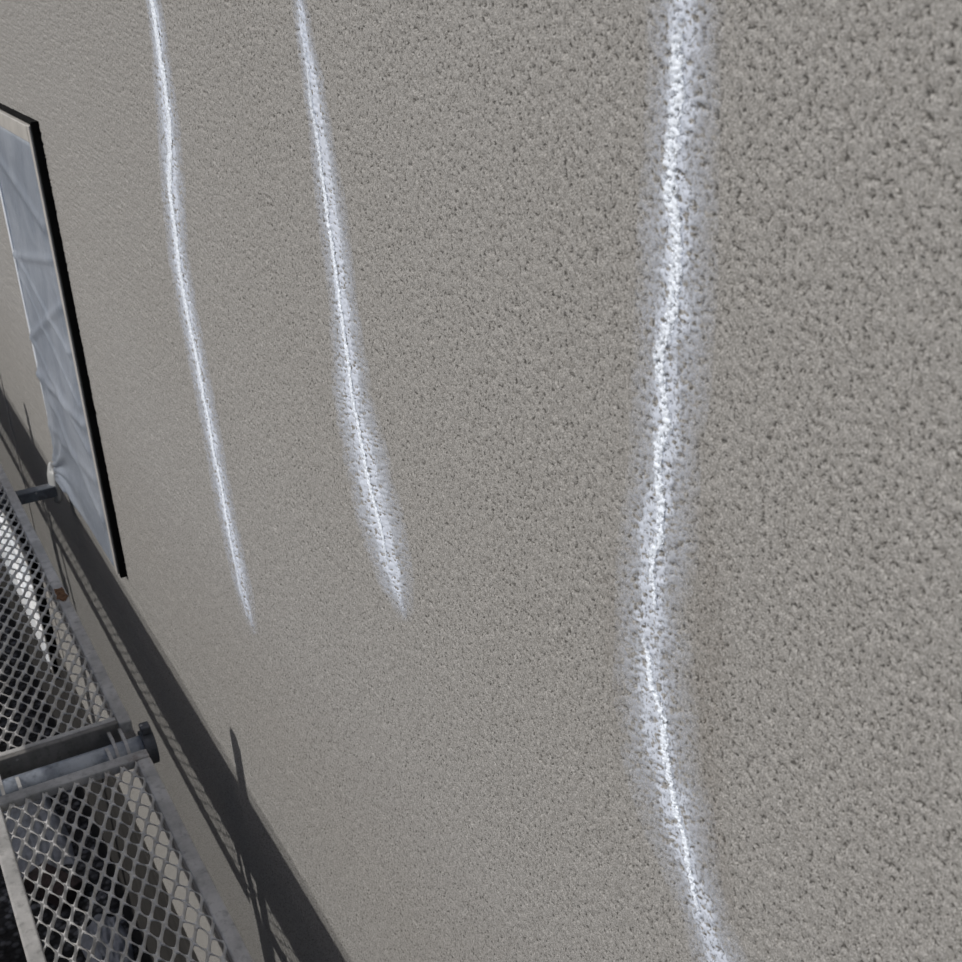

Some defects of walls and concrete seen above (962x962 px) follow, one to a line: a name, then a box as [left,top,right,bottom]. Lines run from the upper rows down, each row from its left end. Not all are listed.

crack [148,0,252,622]
crack [297,0,404,611]
crack [633,0,730,962]